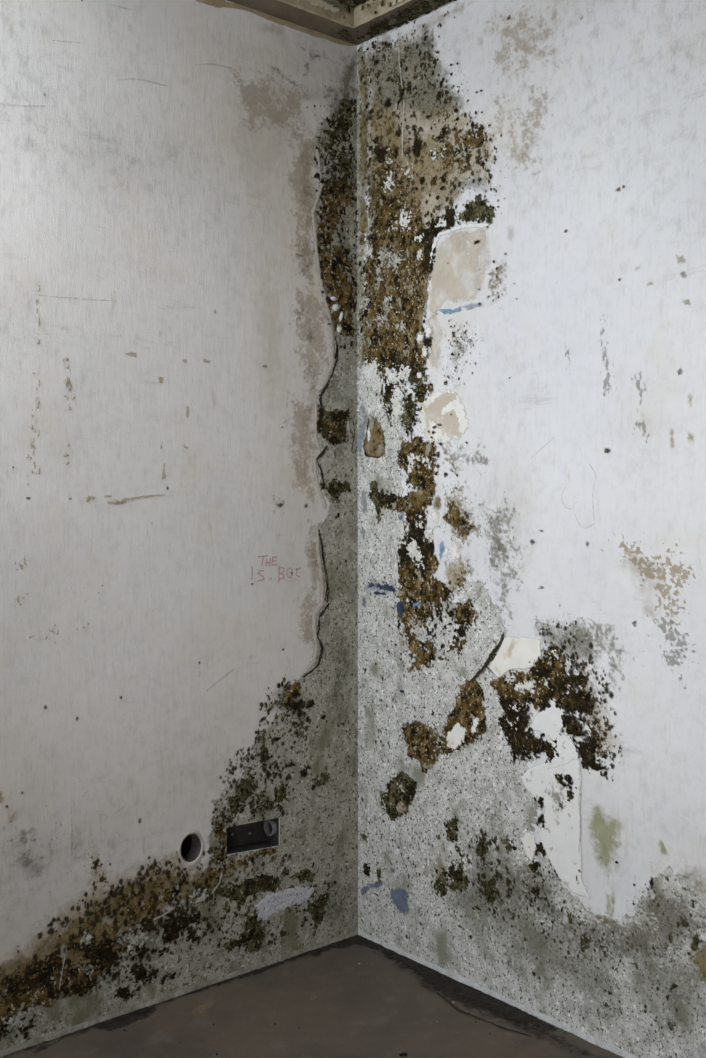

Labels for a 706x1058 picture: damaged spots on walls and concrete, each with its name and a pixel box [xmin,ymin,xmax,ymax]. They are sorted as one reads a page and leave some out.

peeling [196,0,354,46]
flaking render [316,103,357,298]
mould [307,0,523,678]
peeling [428,223,506,364]
flaking render [0,182,359,1051]
mould [375,620,622,821]
flaking render [357,367,706,1058]
leakage [0,674,588,1055]
leakage [431,816,706,969]